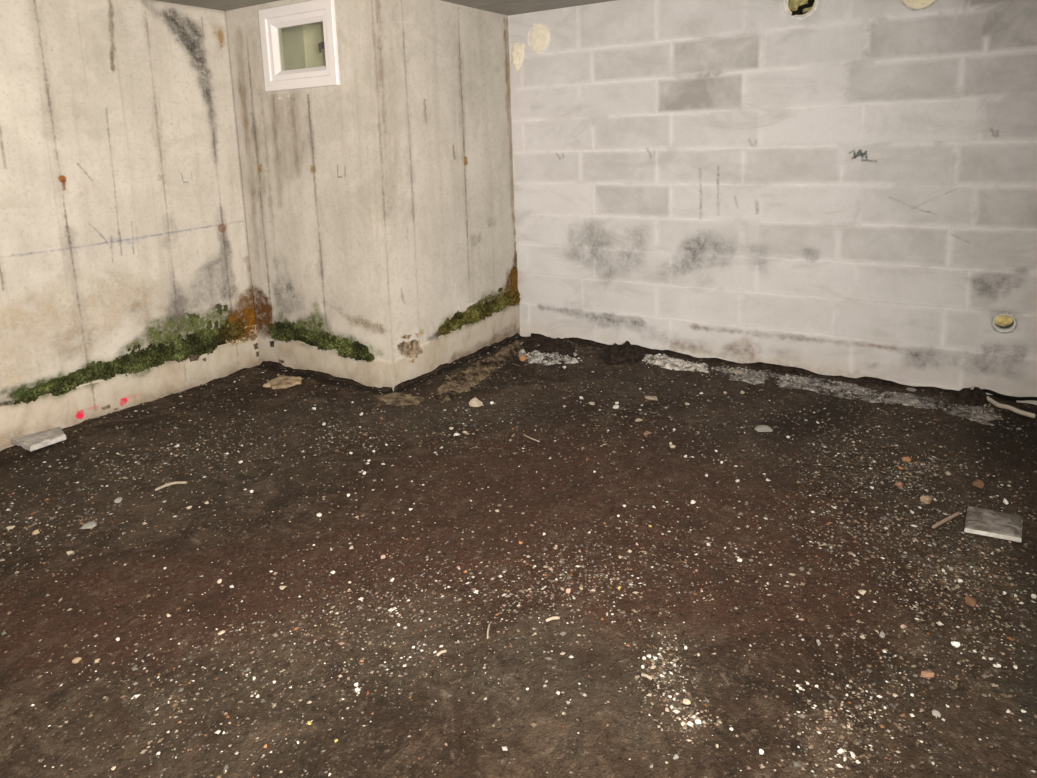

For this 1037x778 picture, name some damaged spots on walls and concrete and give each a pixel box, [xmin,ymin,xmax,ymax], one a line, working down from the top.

water stain [165,11,209,72]
corrosion [228,289,272,339]